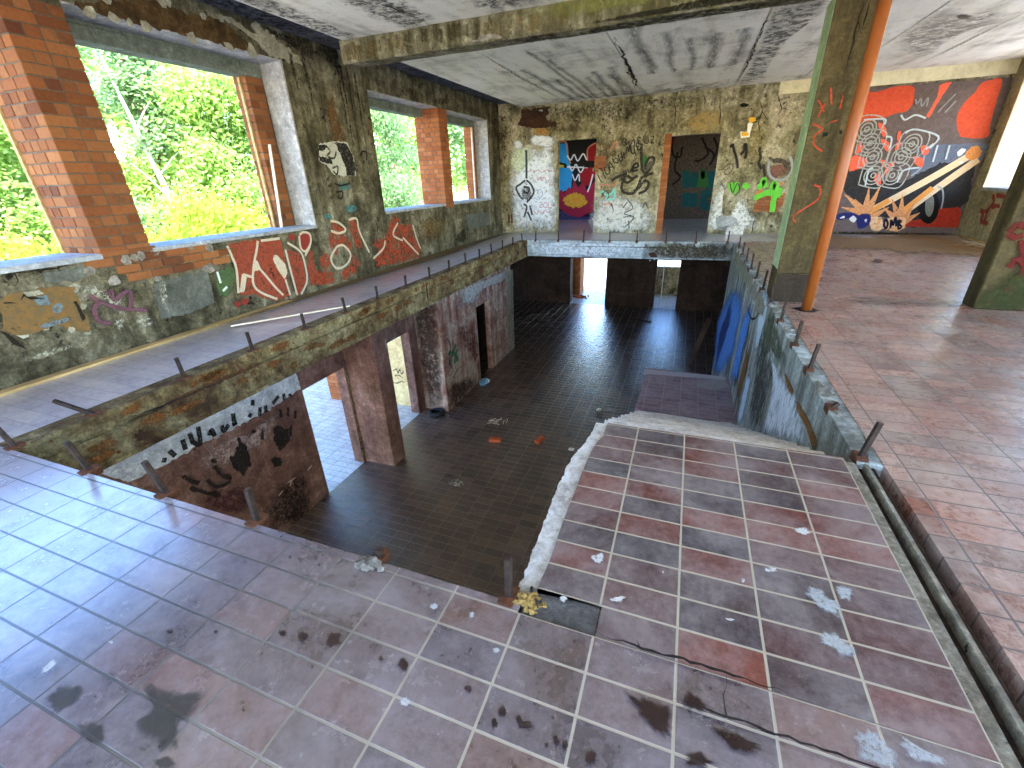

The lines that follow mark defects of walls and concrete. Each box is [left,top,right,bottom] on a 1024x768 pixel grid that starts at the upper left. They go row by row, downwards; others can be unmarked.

spalling [74,0,303,66]
crack [614,37,640,90]
rust [304,333,356,352]
rust [120,368,228,426]
water stain [49,686,81,711]
water stain [79,723,104,743]
water stain [138,685,200,768]
crack [596,631,880,768]